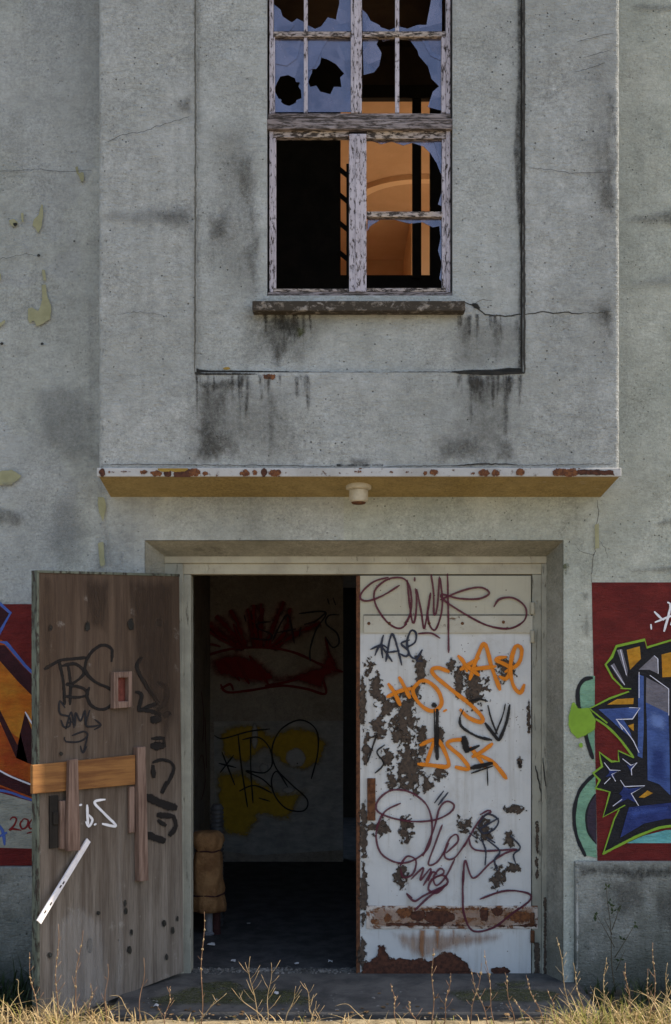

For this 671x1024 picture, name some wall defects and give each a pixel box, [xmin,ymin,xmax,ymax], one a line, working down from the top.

water stain [452,0,526,419]
crack [465,299,612,317]
rust [140,468,208,477]
rust [240,468,281,477]
rust [553,468,614,477]
crack [577,500,608,582]